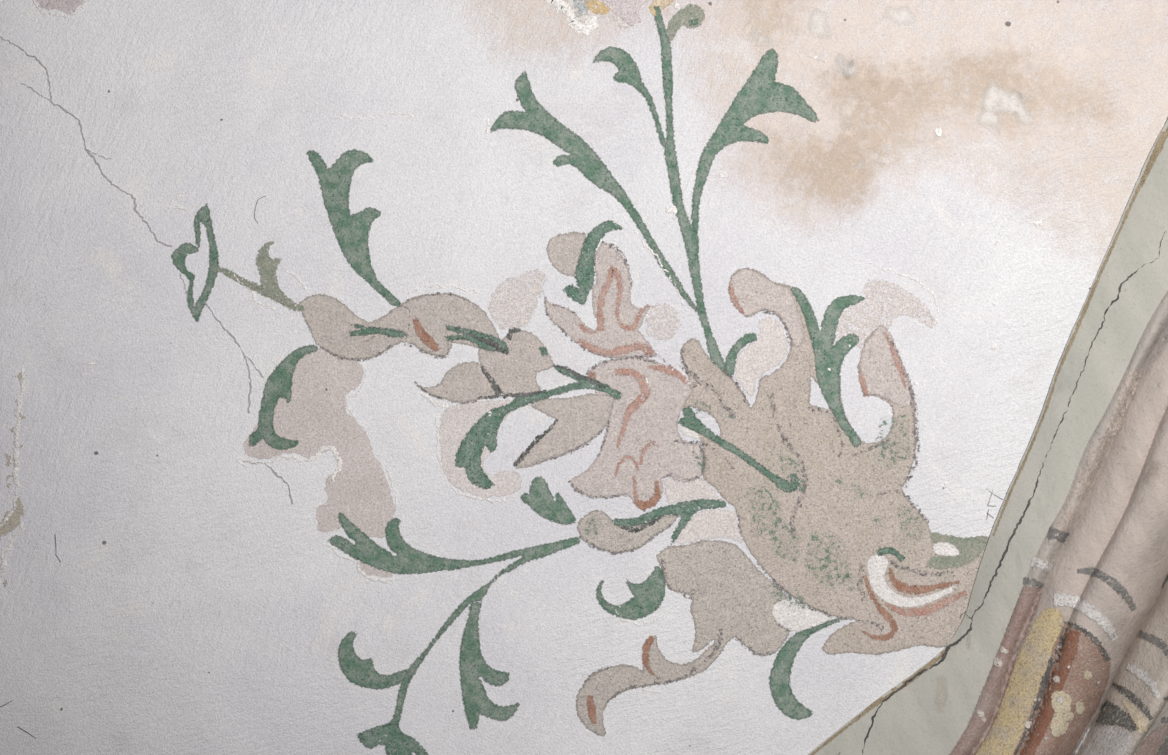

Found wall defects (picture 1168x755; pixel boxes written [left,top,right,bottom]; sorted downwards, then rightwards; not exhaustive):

crack [0,36,264,413]
peeling [546,0,629,35]
water stain [699,0,1168,240]
peeling [0,368,27,587]
crack [838,232,1165,755]